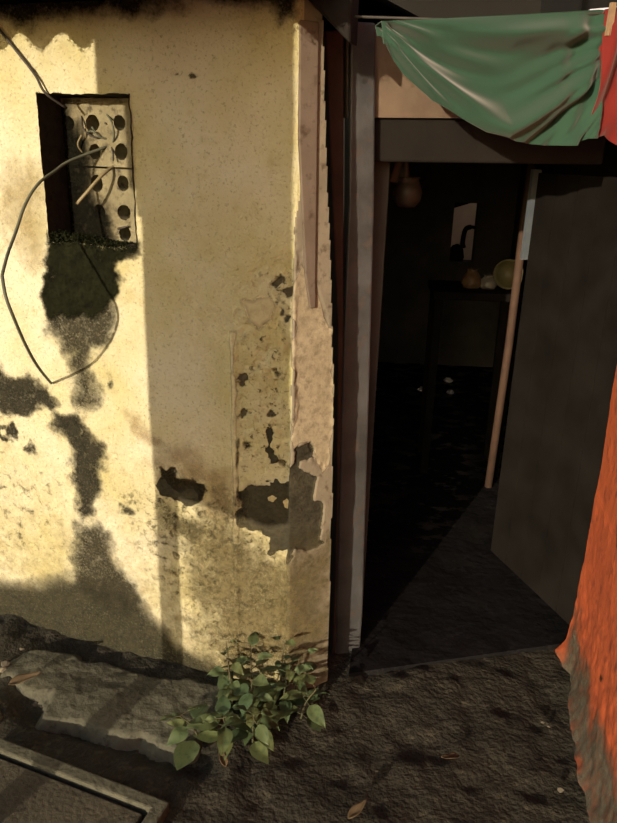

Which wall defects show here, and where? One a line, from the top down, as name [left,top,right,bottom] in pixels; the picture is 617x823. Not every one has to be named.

flaking render [156,466,205,506]
peeling [235,264,334,564]